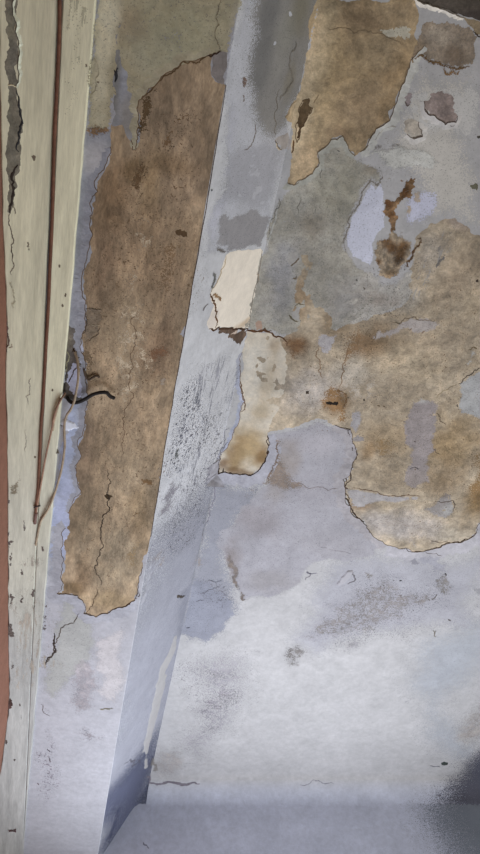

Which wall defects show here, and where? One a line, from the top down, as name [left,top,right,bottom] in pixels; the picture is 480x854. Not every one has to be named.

peeling [282,0,480,190]
rust [374,178,422,279]
crack [121,311,138,453]
peeling [45,47,480,794]
peeling [8,588,57,687]
crack [45,471,112,664]